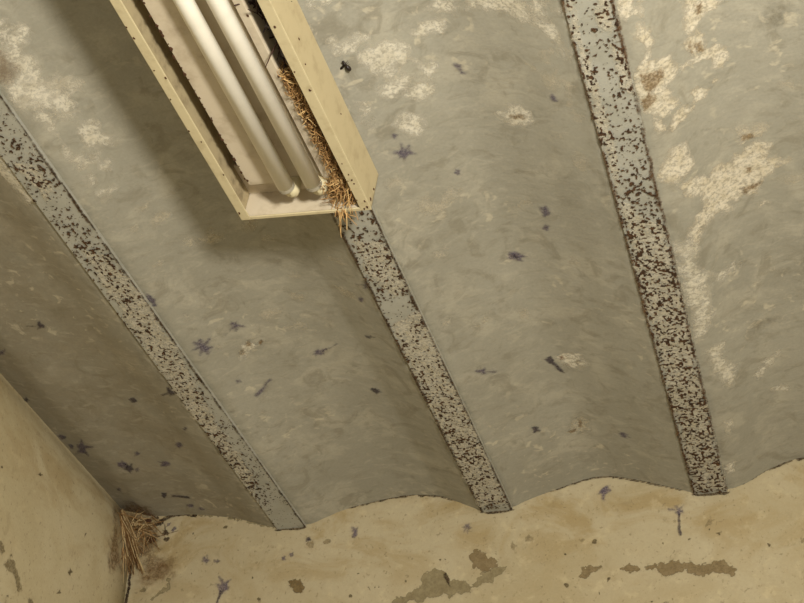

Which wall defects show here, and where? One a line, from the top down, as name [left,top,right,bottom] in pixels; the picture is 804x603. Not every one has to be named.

flaking render [392,549,507,603]
flaking render [579,565,602,579]
flaking render [620,560,737,577]